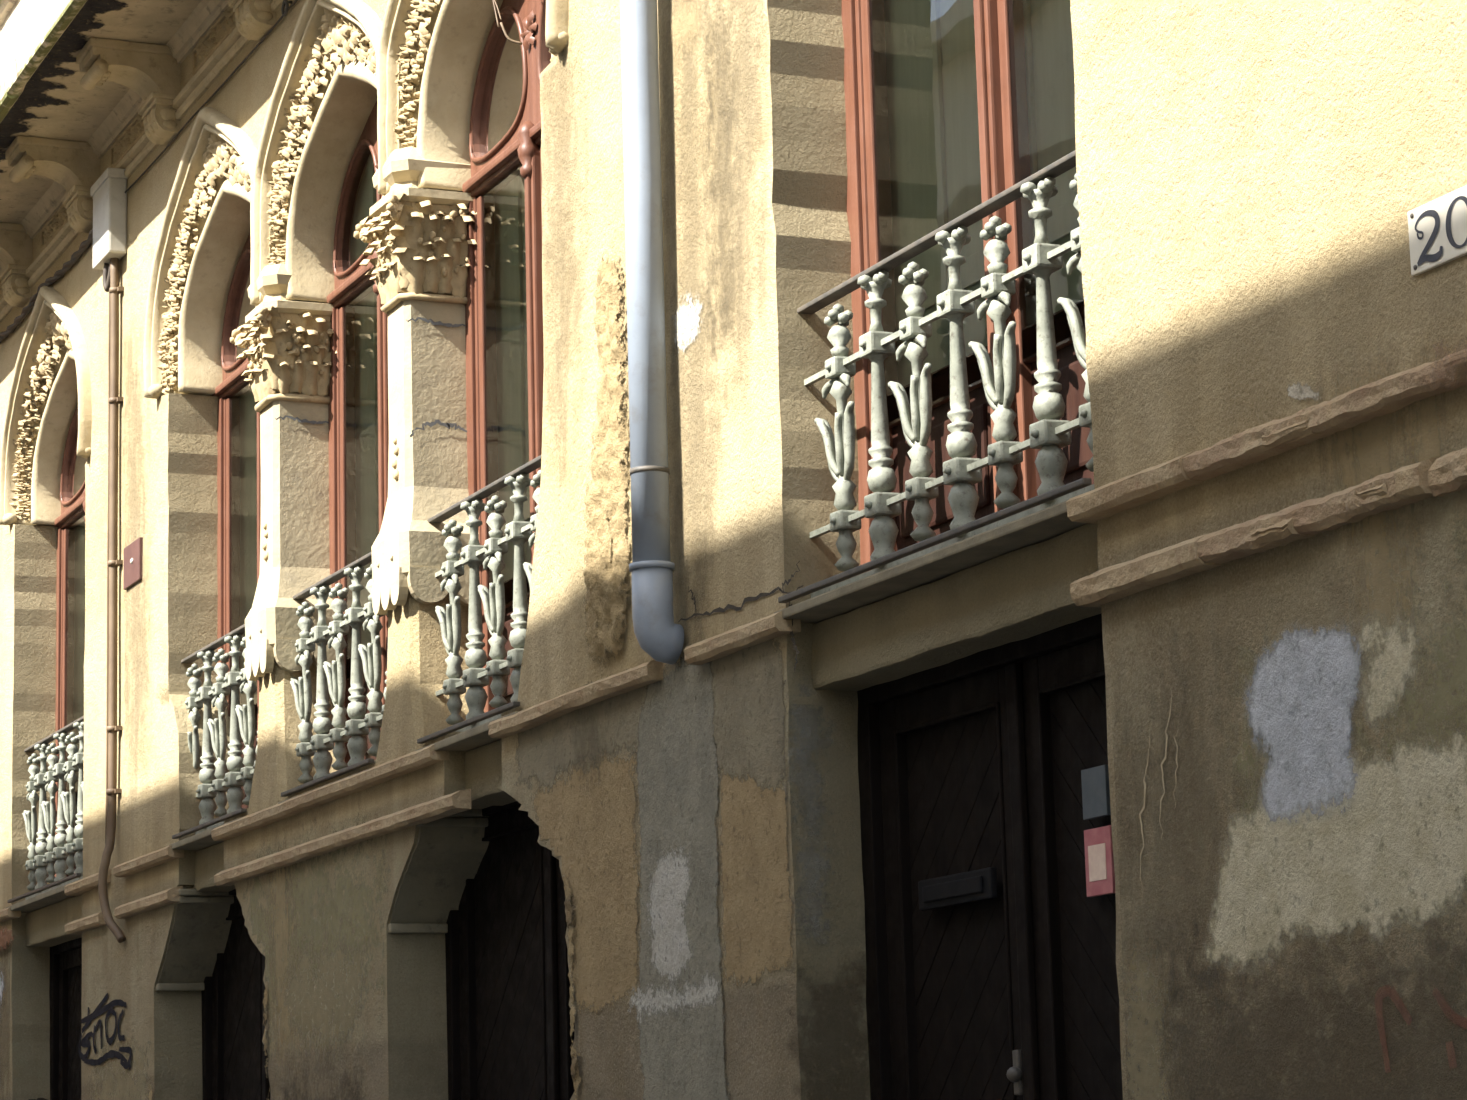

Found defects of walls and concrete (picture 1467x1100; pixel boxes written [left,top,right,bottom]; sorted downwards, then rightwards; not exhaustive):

flaking render [561,875,582,1100]